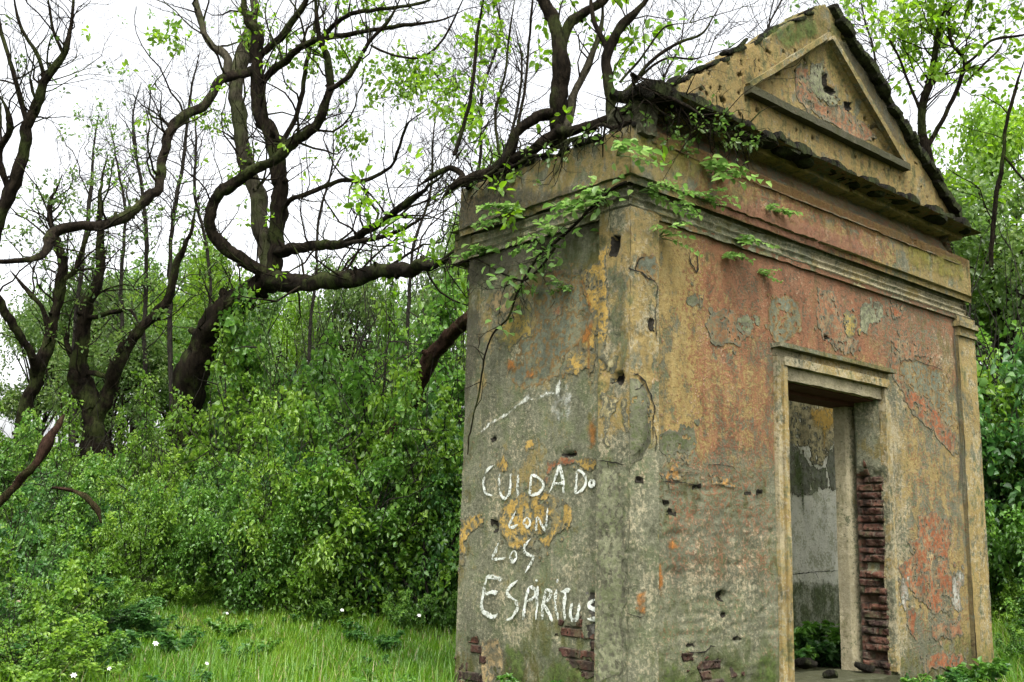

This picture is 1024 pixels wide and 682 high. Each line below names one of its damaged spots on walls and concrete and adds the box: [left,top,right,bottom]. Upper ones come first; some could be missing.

peeling [795,62,877,141]
crack [628,257,658,336]
peeling [686,282,959,456]
peeling [498,450,627,682]
flaking render [856,460,966,675]
flaking render [681,653,745,682]